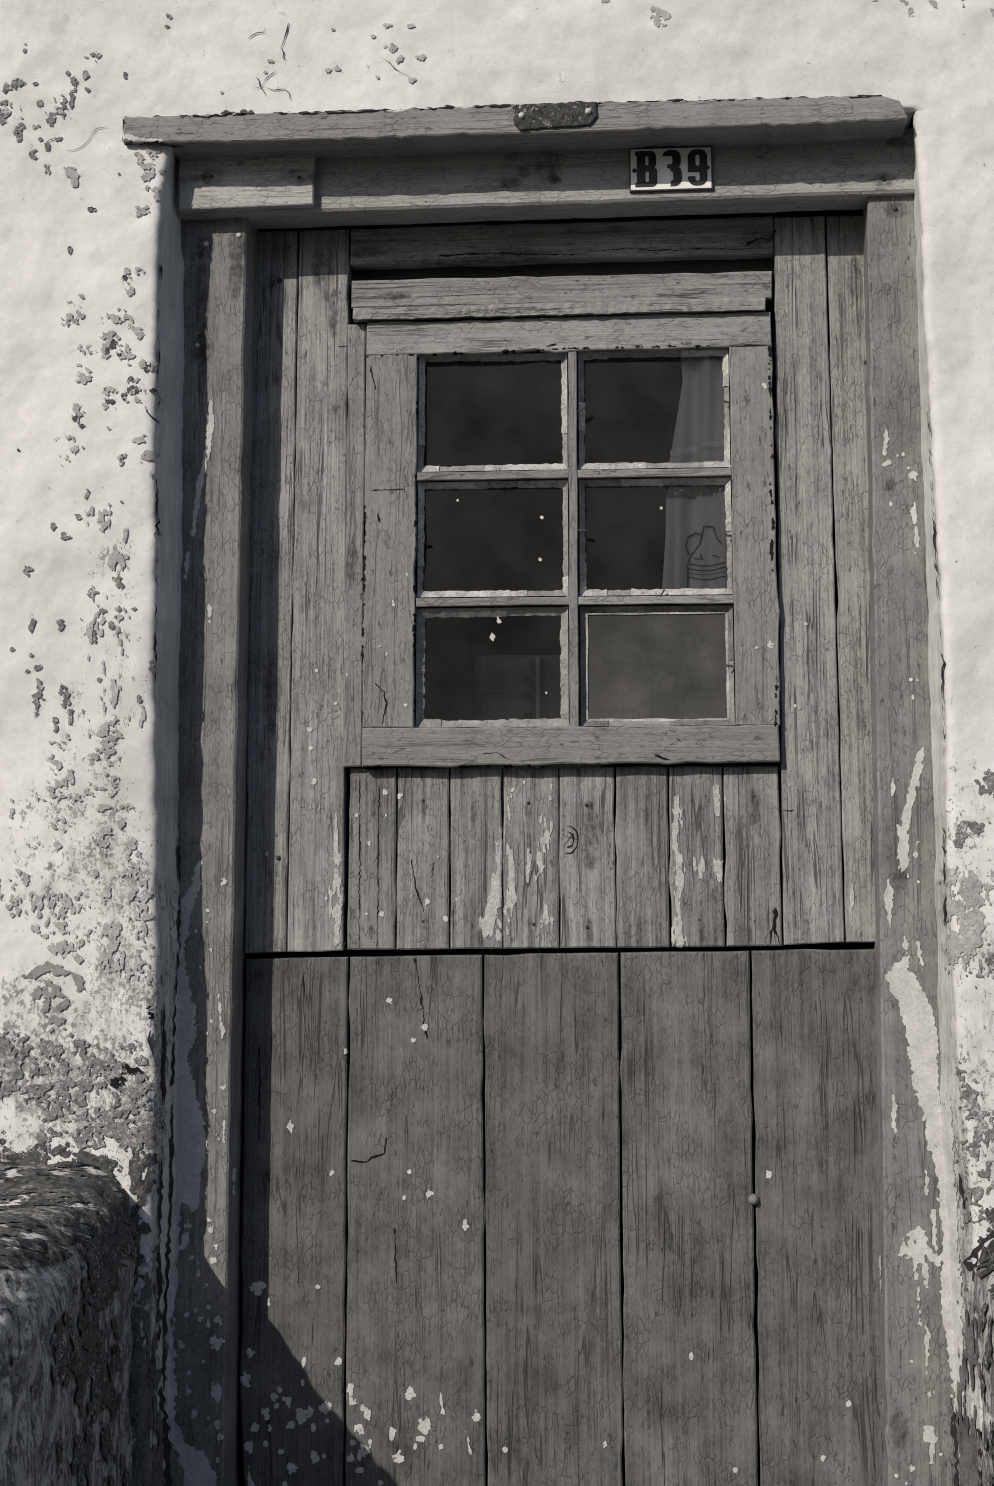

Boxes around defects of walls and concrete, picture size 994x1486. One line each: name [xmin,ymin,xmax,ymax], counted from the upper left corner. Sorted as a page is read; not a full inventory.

spalling [21,961,84,1033]
peeling [0,1028,32,1100]
peeling [71,1006,161,1157]